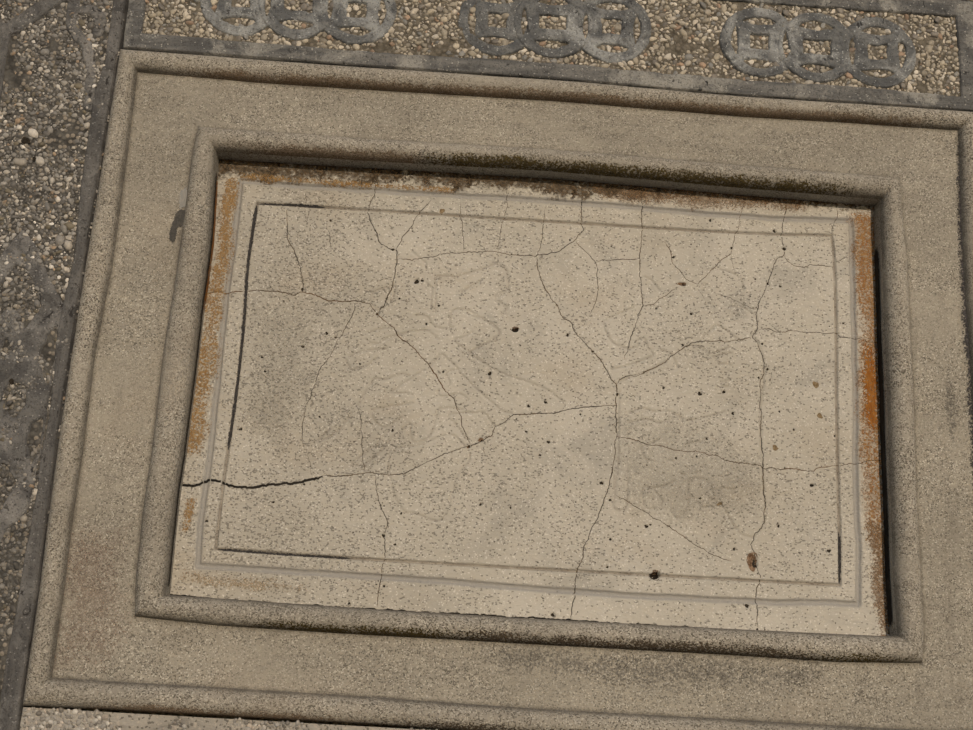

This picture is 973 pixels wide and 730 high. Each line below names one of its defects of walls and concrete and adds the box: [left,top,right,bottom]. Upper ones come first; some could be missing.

corrosion [183,498,196,532]
corrosion [187,173,453,454]
crack [168,174,892,629]
corrosion [851,213,890,636]